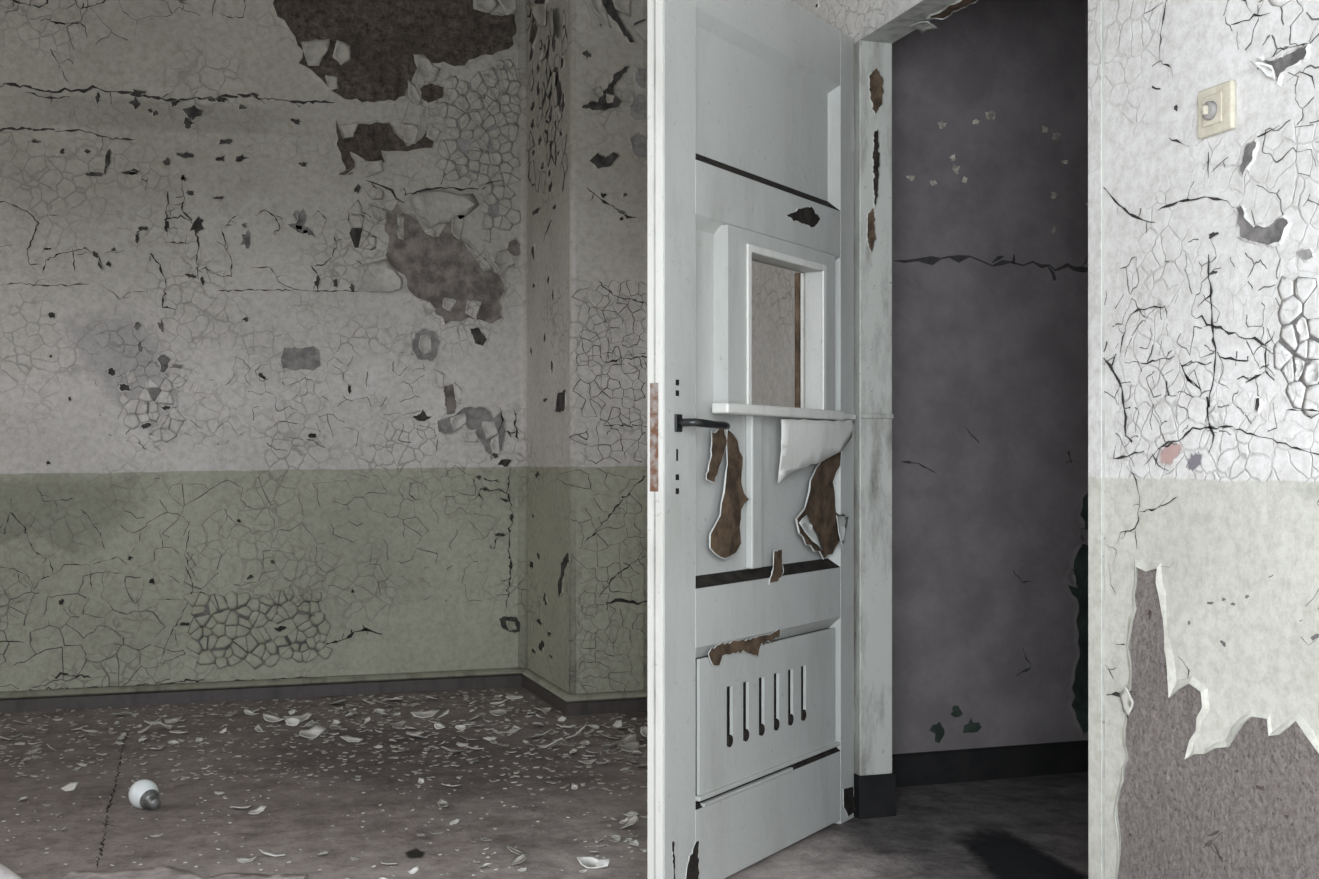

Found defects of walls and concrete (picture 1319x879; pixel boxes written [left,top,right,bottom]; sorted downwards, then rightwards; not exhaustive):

crack [0,0,334,151]
peeling [215,138,250,163]
flaking render [269,0,647,468]
peeling [786,206,820,229]
flaking render [866,66,885,254]
crack [894,0,1319,594]
flaking render [1238,137,1259,178]
peeling [1234,204,1319,419]
flaking render [1250,42,1312,87]
crack [0,352,520,690]
crack [1106,644,1132,717]
flaking render [1113,559,1319,879]